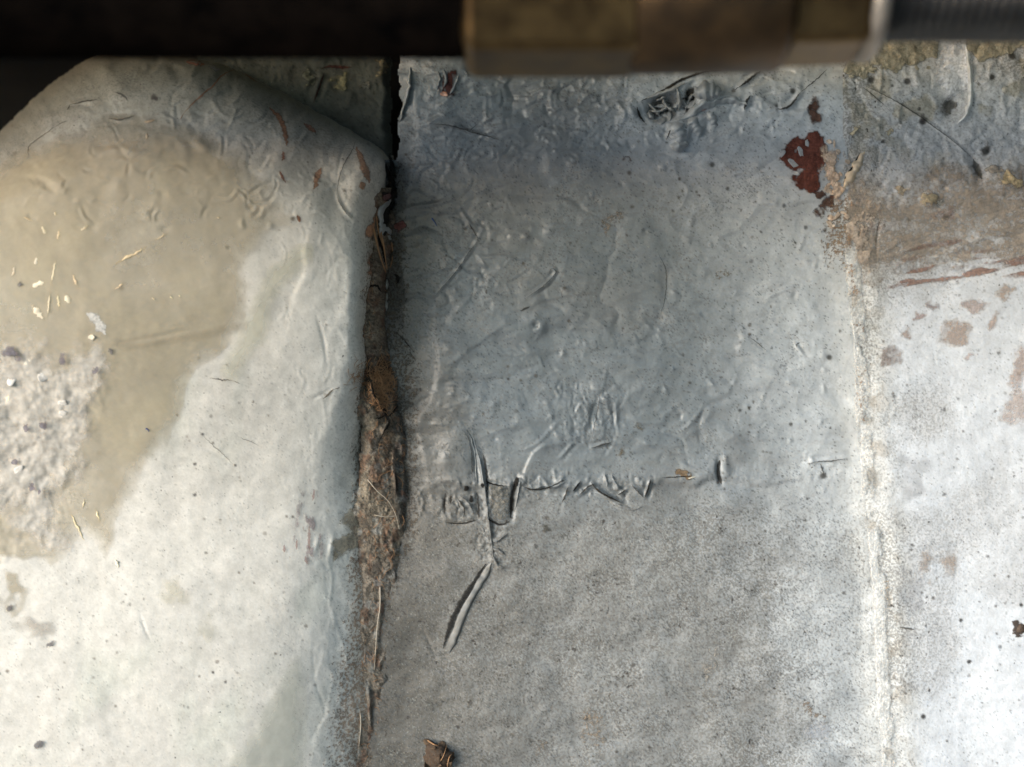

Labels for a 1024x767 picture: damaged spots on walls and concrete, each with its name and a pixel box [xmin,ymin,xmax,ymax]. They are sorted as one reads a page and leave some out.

rust [807,97,822,124]
crack [369,153,400,292]
water stain [0,134,259,535]
crack [367,358,398,499]
water stain [0,483,59,556]